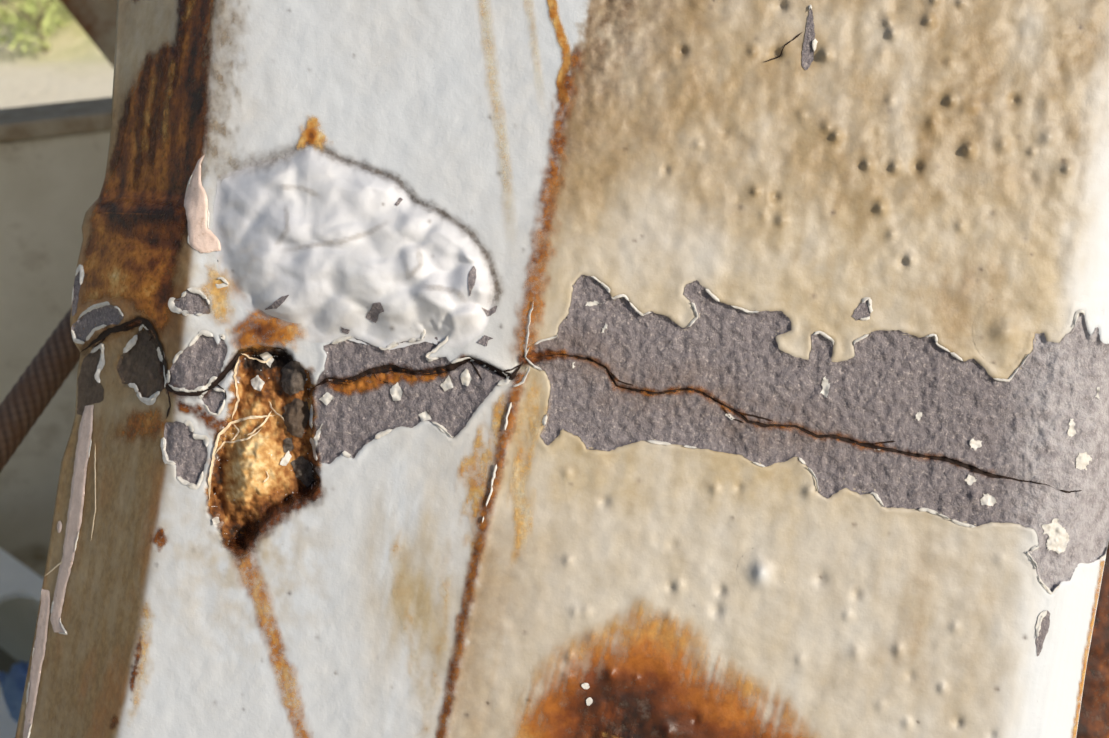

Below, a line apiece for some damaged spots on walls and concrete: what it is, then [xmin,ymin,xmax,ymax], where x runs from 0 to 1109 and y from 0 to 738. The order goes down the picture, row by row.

rust [82,0,214,331]
crack [81,316,290,418]
spalling [71,264,510,548]
rust [436,0,581,738]
crack [312,349,1082,493]
peeling [525,275,1109,594]
rust [236,528,309,738]
rust [516,605,808,738]
peeling [1036,610,1050,656]
rust [1072,540,1109,738]